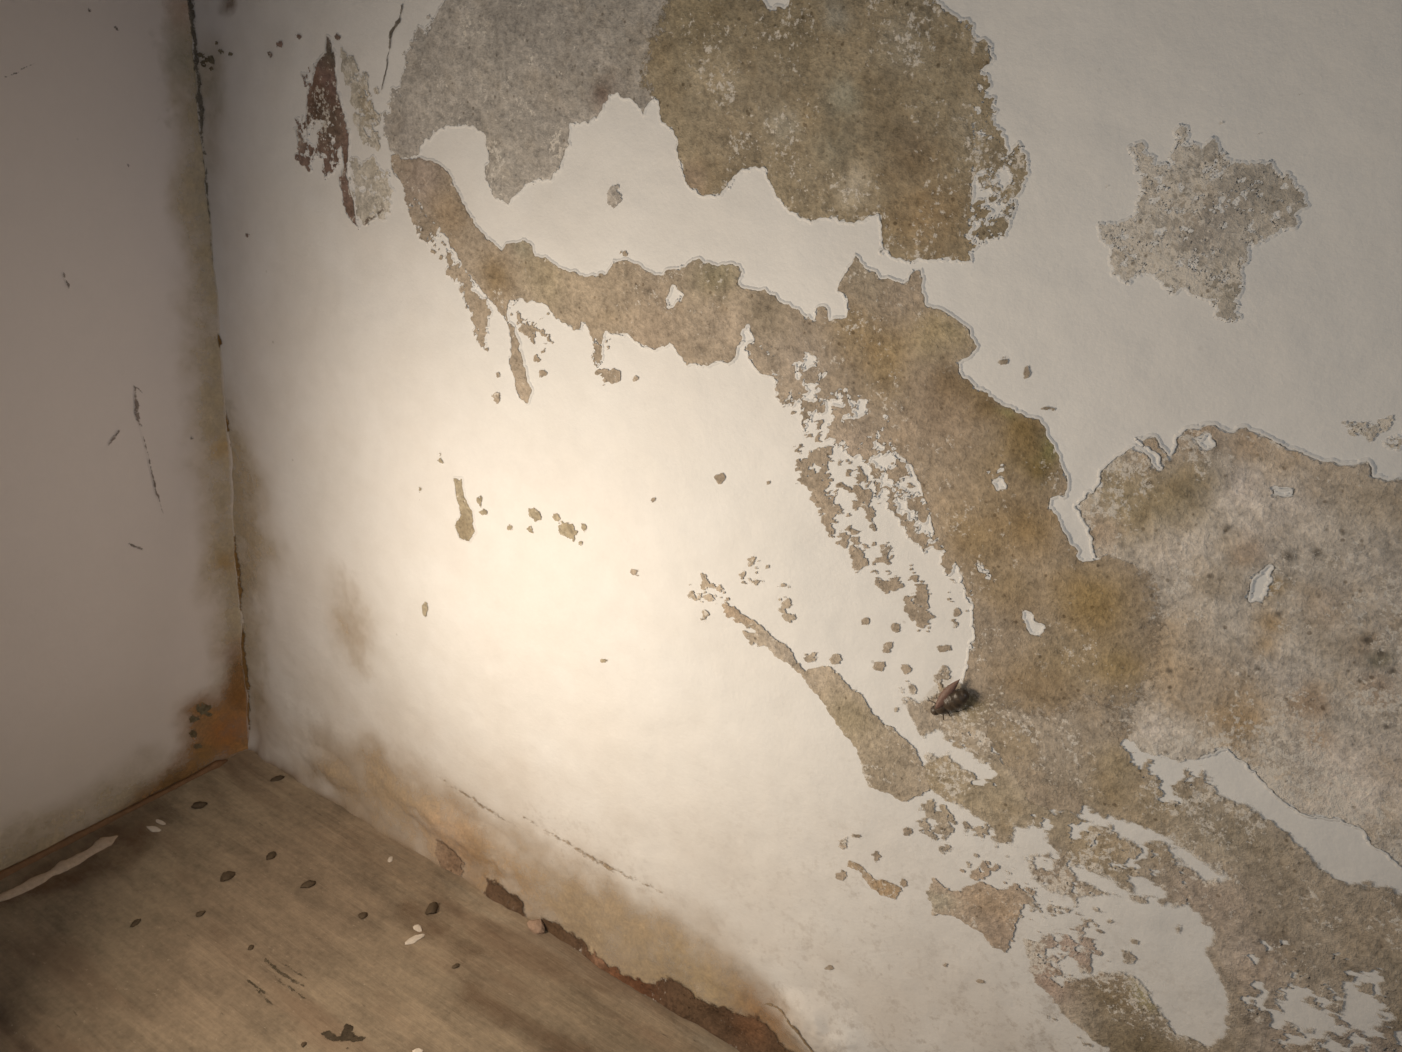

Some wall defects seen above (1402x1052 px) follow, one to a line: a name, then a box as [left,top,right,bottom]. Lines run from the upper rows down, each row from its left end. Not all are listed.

damp [200,340,262,662]
peeling [293,0,1402,1052]
damp [189,702,213,749]
damp [318,749,801,1052]